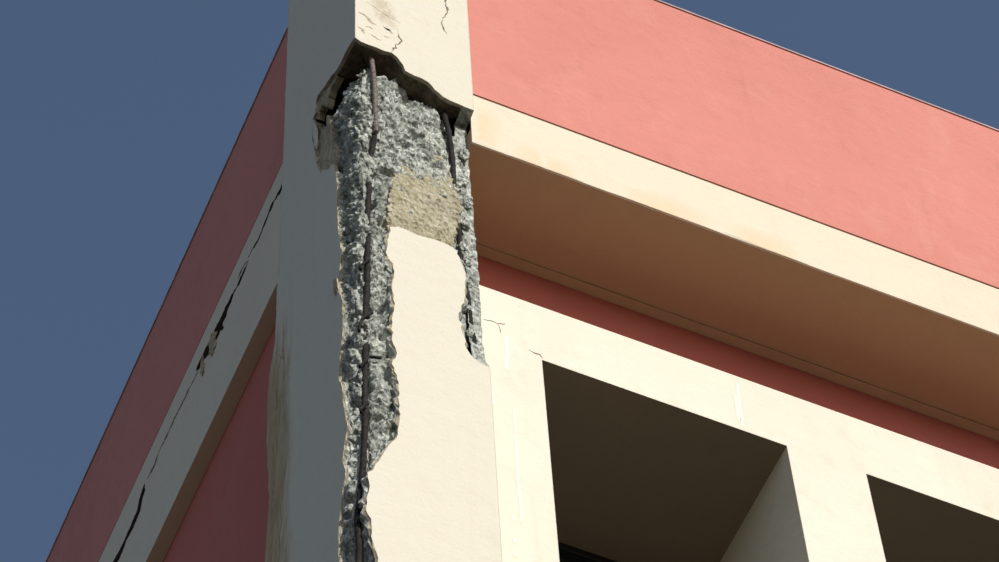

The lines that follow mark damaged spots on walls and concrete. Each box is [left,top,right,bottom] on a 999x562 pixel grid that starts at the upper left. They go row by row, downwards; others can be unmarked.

crack [147,372,198,479]
spalling [312,0,490,562]